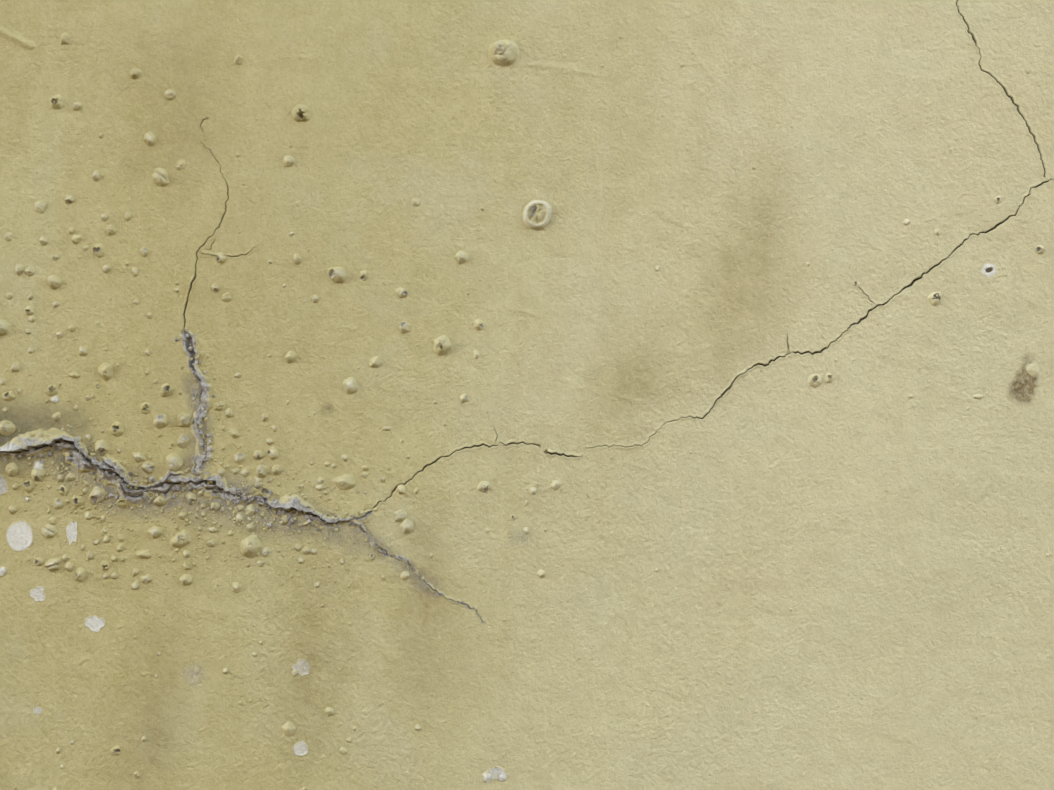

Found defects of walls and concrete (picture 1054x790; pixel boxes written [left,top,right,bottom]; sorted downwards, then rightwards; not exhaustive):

crack [0,0,1054,624]